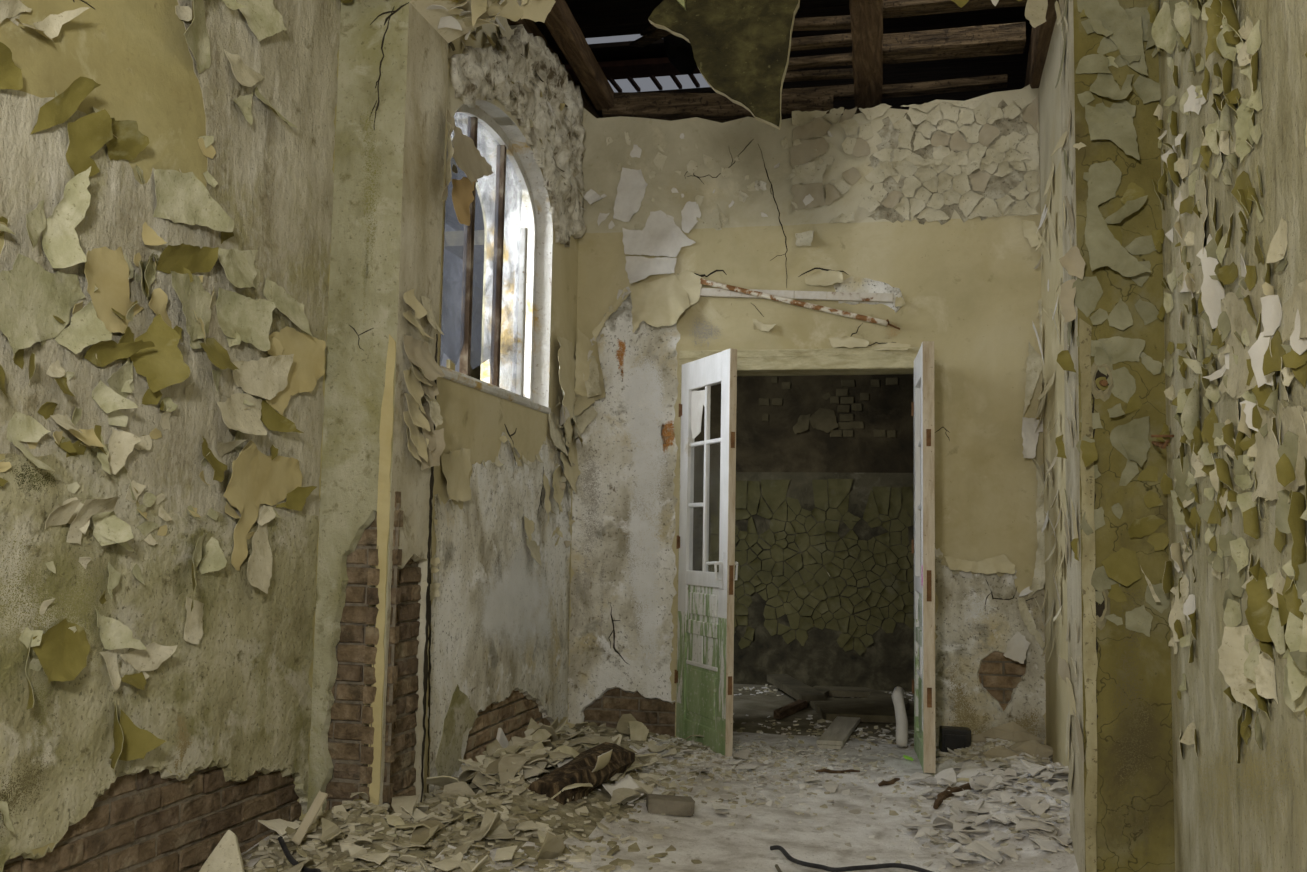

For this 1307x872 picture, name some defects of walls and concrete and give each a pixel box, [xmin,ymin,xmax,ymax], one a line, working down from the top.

crack [369,2,409,130]
crack [684,141,848,288]
peeling [0,0,767,872]
peeling [774,0,1307,794]
peeling [708,479,914,655]